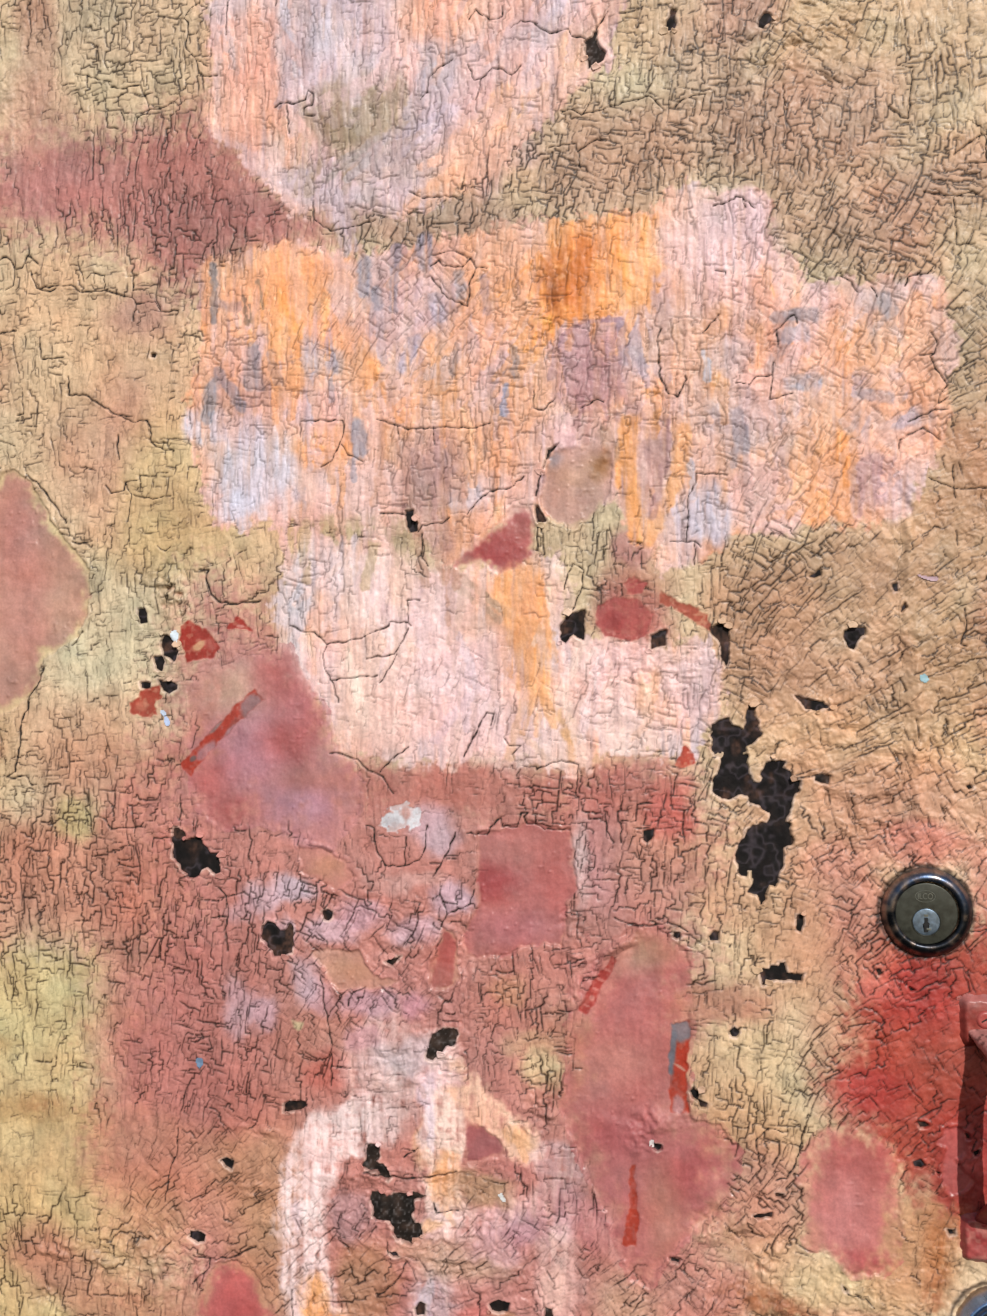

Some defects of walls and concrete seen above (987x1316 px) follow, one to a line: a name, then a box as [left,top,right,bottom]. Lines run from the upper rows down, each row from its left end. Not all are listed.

crack [924,133,987,245]
crack [2,255,178,319]
crack [0,330,173,545]
peeling [0,467,93,718]
crack [315,600,420,702]
peeling [557,608,585,645]
crack [0,669,44,785]
peeling [131,609,369,920]
peeling [711,699,829,909]
crack [366,812,554,927]
peeling [261,922,294,961]
peeling [356,1142,426,1256]